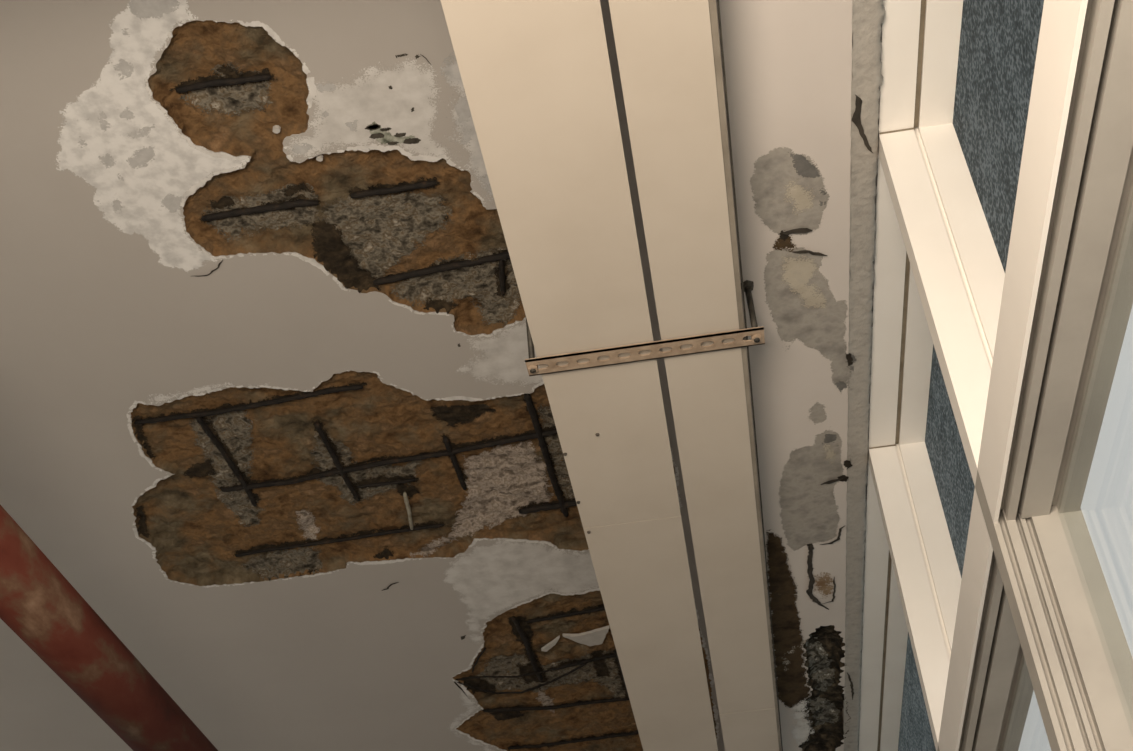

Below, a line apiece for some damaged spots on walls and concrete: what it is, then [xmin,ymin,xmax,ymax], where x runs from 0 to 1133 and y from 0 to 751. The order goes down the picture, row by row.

peeling [750,147,857,392]
spalling [56,0,643,751]
spalling [671,447,682,511]
peeling [778,402,853,551]
spalling [694,599,719,740]